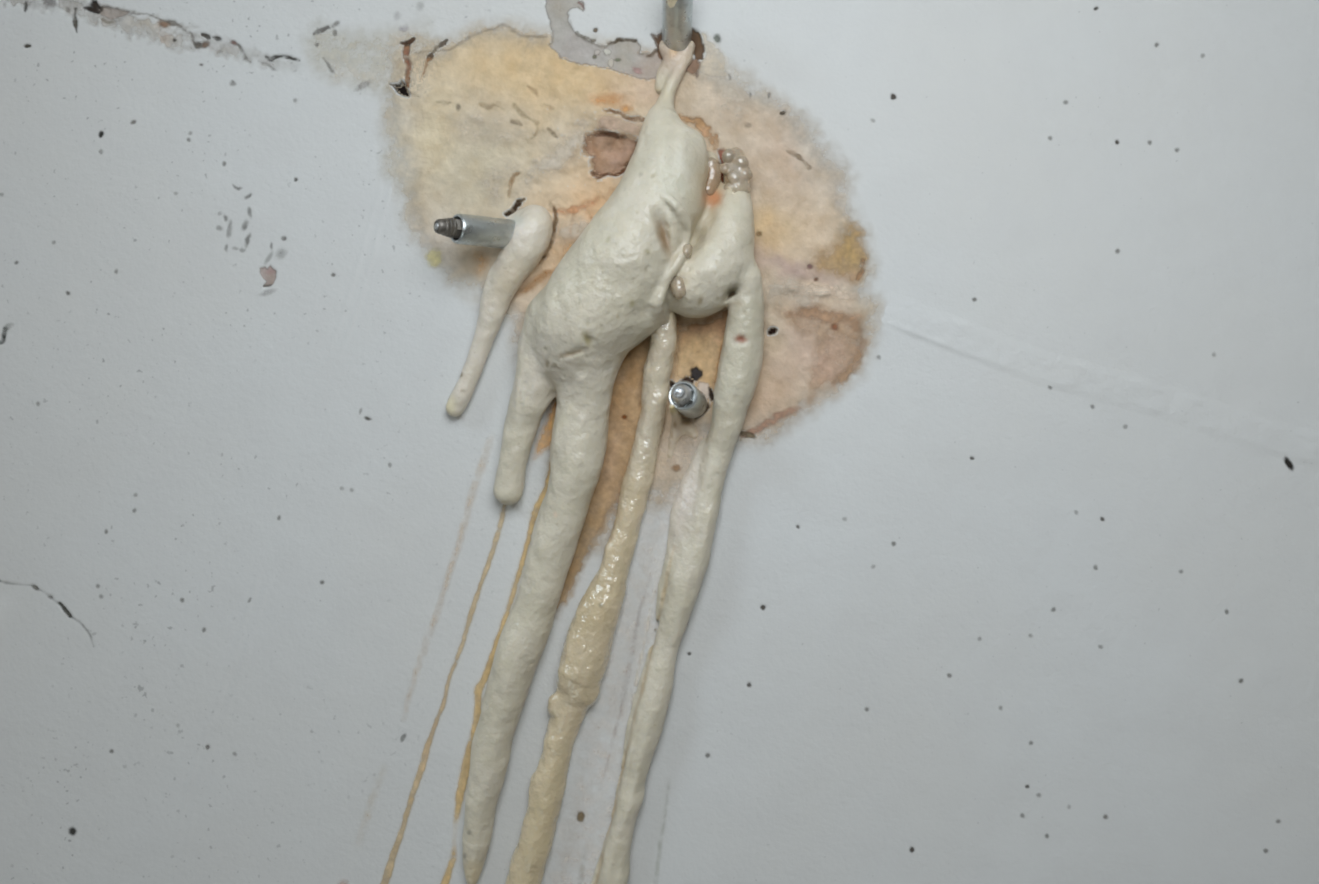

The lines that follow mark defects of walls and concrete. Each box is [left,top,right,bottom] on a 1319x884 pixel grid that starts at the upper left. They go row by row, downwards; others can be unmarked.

crack [11,0,296,61]
peeling [545,0,663,80]
spalling [686,59,700,74]
leakage [386,27,876,438]
leakage [648,293,735,502]
crack [33,585,73,618]